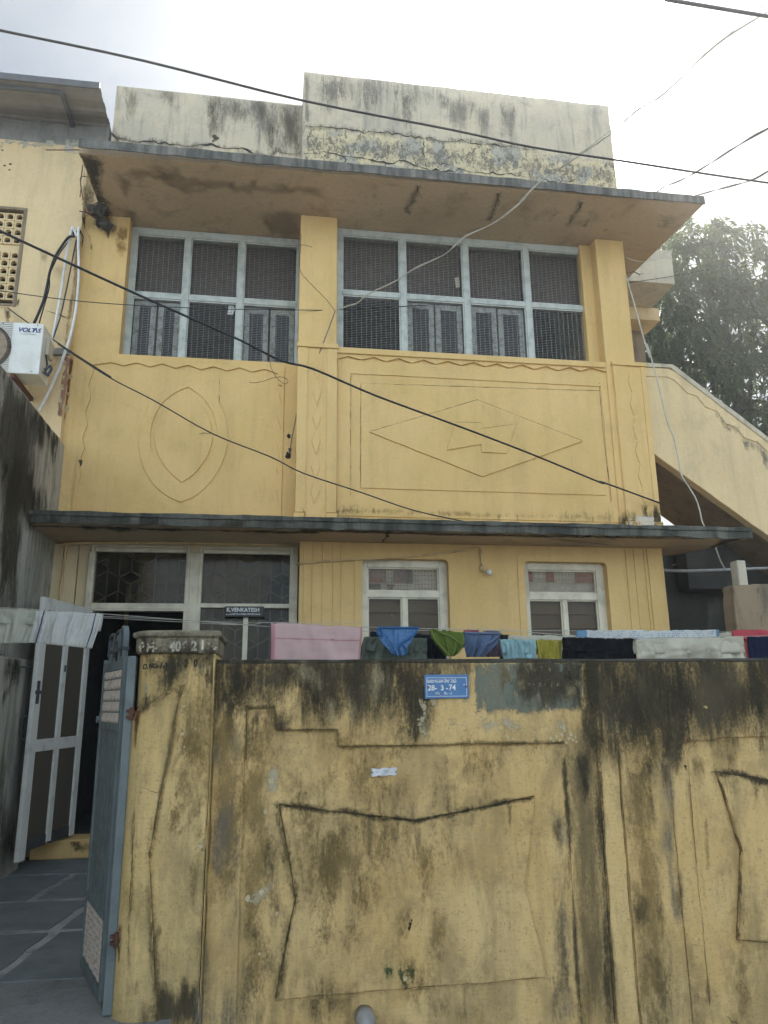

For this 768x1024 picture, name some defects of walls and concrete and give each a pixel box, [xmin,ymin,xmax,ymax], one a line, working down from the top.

leakage [210,100,309,148]
crack [111,97,583,223]
peeling [123,124,617,188]
leakage [34,414,58,451]
leakage [6,460,43,516]
leakage [380,661,428,742]
leakage [164,640,286,937]
leakage [557,755,607,889]
leakage [612,661,701,860]
leakage [618,762,663,1021]
leakage [562,917,580,998]
leakage [603,904,613,991]